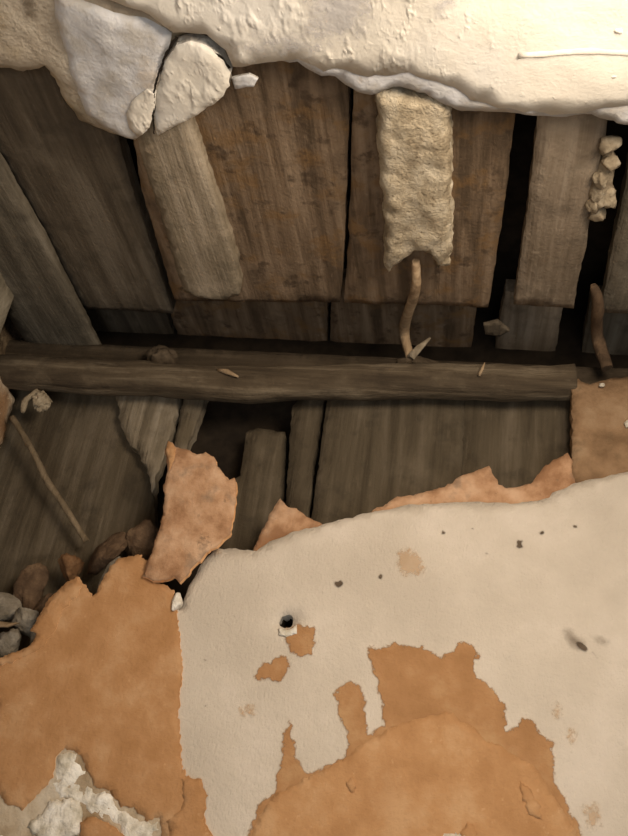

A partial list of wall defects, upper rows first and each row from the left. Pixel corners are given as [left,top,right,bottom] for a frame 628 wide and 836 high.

crack [152,36,179,134]
spalling [281,59,628,125]
flaking render [372,377,628,512]
flaking render [253,499,323,551]
peeling [0,441,238,836]
spalling [255,624,315,682]
peeling [248,642,581,836]